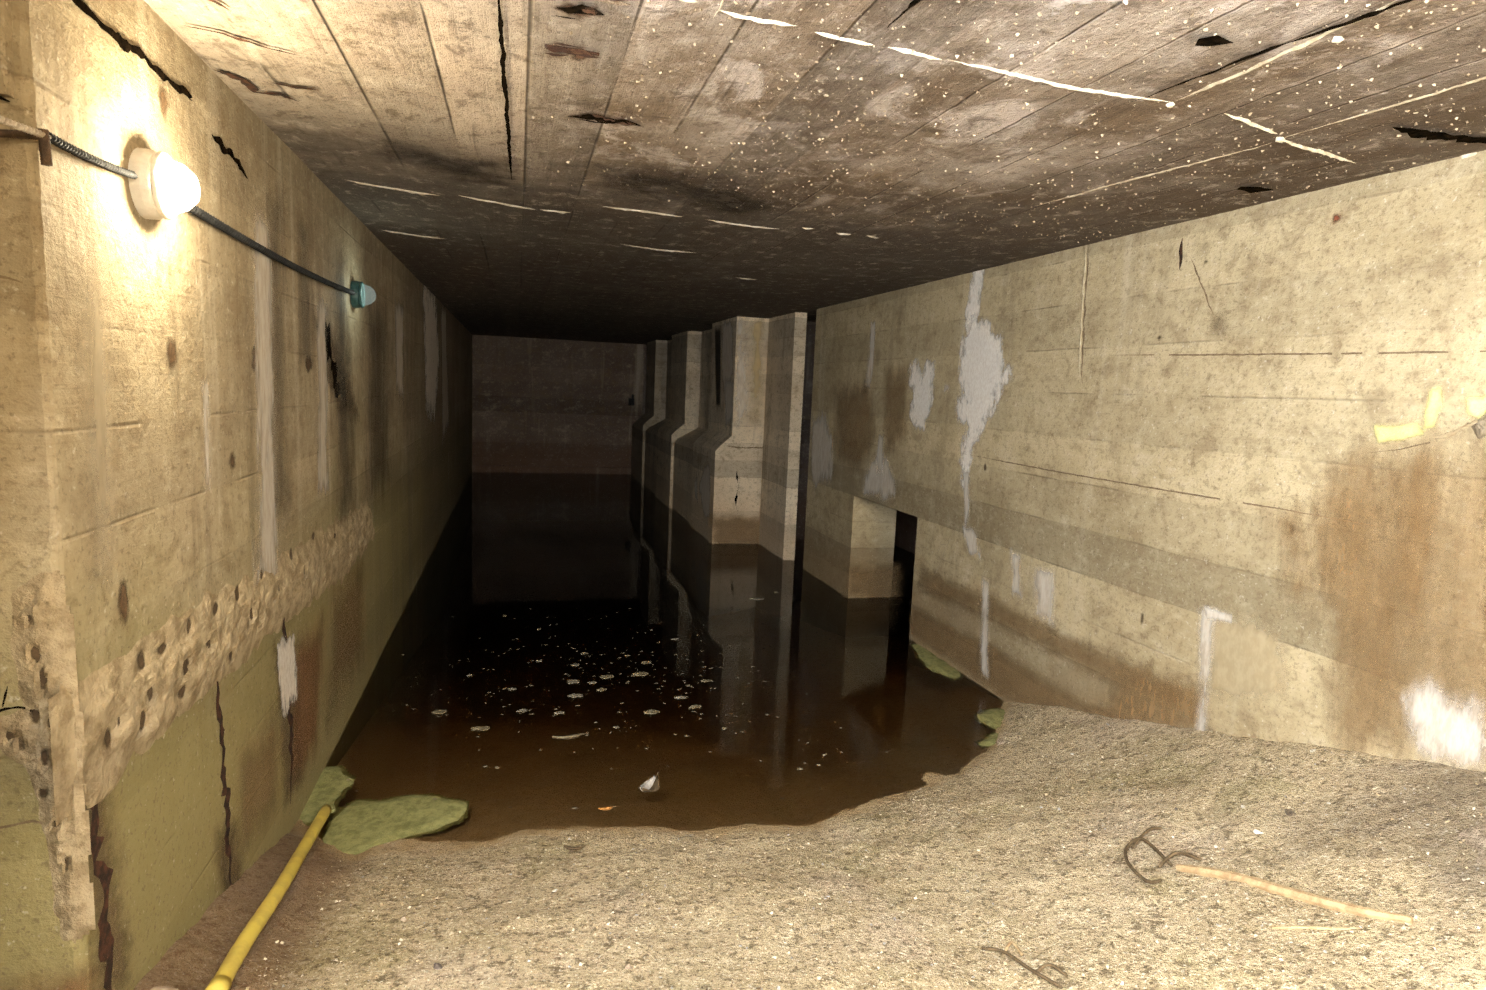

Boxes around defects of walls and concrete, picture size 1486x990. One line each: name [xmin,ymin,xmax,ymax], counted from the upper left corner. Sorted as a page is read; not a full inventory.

crack [887,0,922,28]
crack [72,0,317,102]
crack [212,134,248,179]
water stain [812,269,1011,553]
spalling [119,582,129,622]
water stain [1355,471,1486,759]
spalling [31,646,47,689]
spalling [137,643,166,669]
spalling [178,659,189,698]
spalling [30,709,50,728]
spalling [139,687,153,730]
spalling [6,731,49,766]